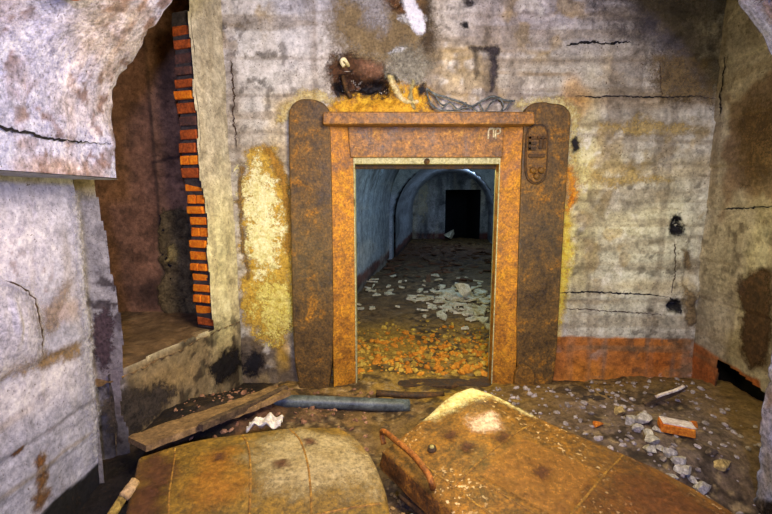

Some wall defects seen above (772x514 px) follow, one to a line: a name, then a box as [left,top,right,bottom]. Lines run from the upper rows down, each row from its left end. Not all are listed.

crack [0,125,111,144]
damp [737,269,772,370]
rust [31,455,51,511]